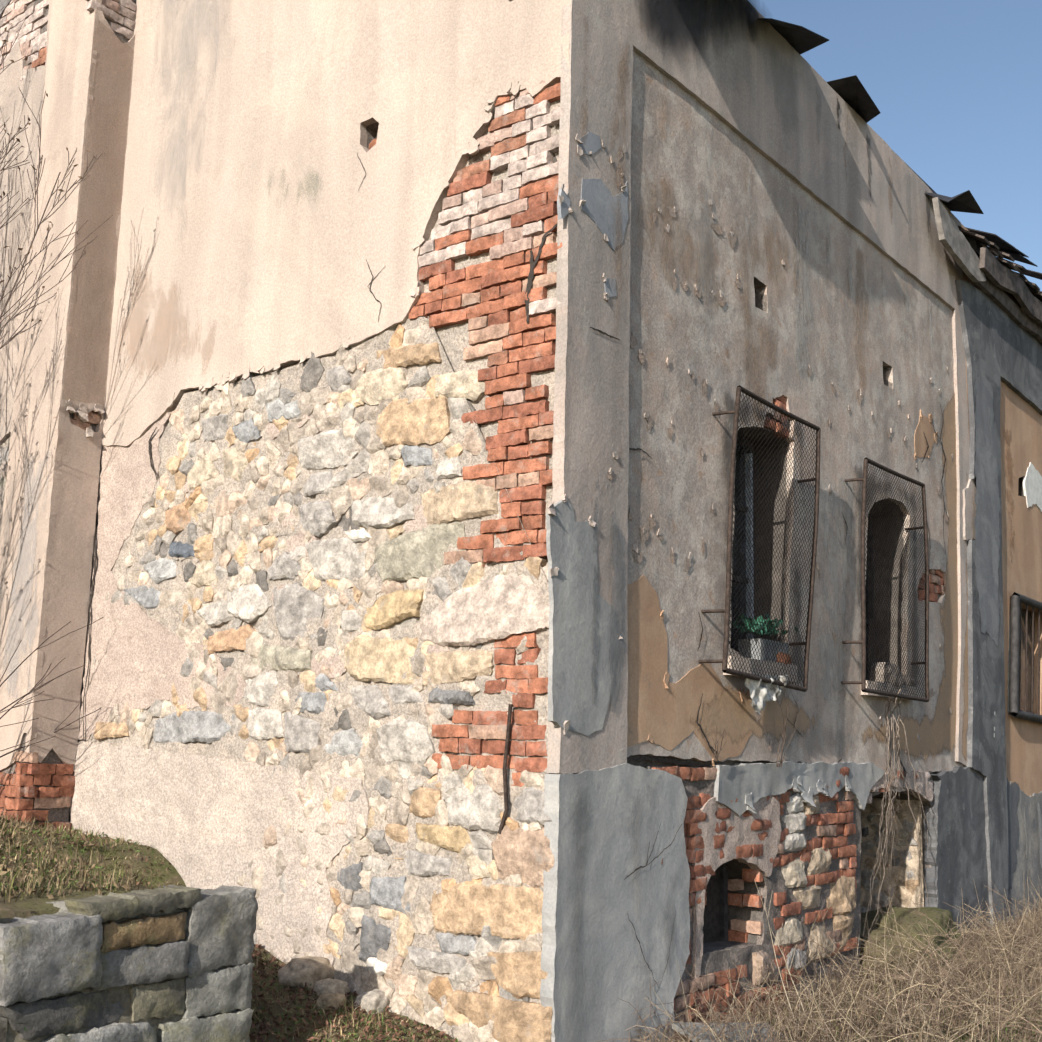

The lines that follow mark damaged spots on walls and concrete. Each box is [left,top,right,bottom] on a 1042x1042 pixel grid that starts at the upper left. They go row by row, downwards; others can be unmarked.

spalling [86,0,136,43]
crack [366,260,381,321]
spalling [54,399,105,438]
spalling [0,436,10,537]
crack [83,521,96,741]
spalling [78,80,629,1042]
spalling [917,569,946,602]
spalling [0,733,75,831]
spalling [643,759,933,1042]